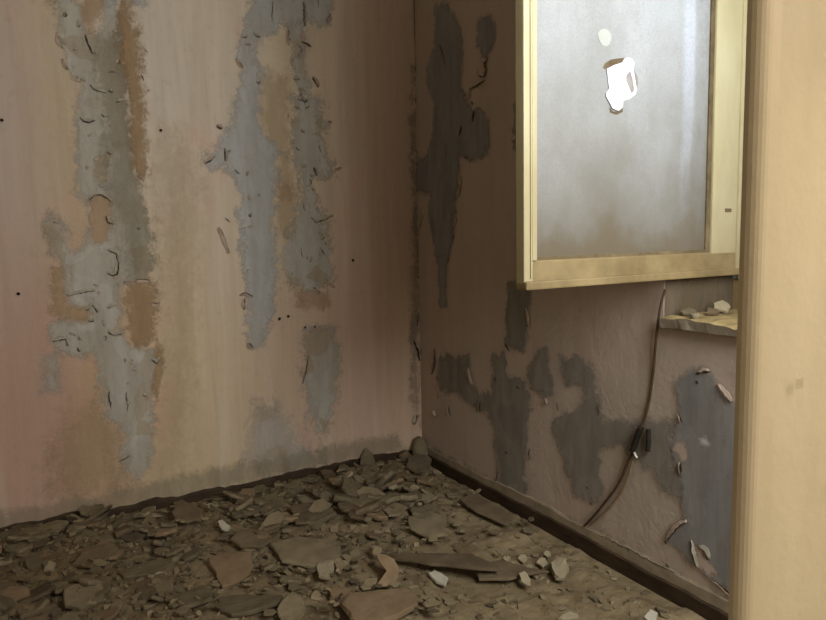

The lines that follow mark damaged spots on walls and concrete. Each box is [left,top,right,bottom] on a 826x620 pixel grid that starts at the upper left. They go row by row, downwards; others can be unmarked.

peeling [43,0,160,479]
peeling [204,0,335,349]
peeling [416,3,495,307]
peeling [428,281,735,597]